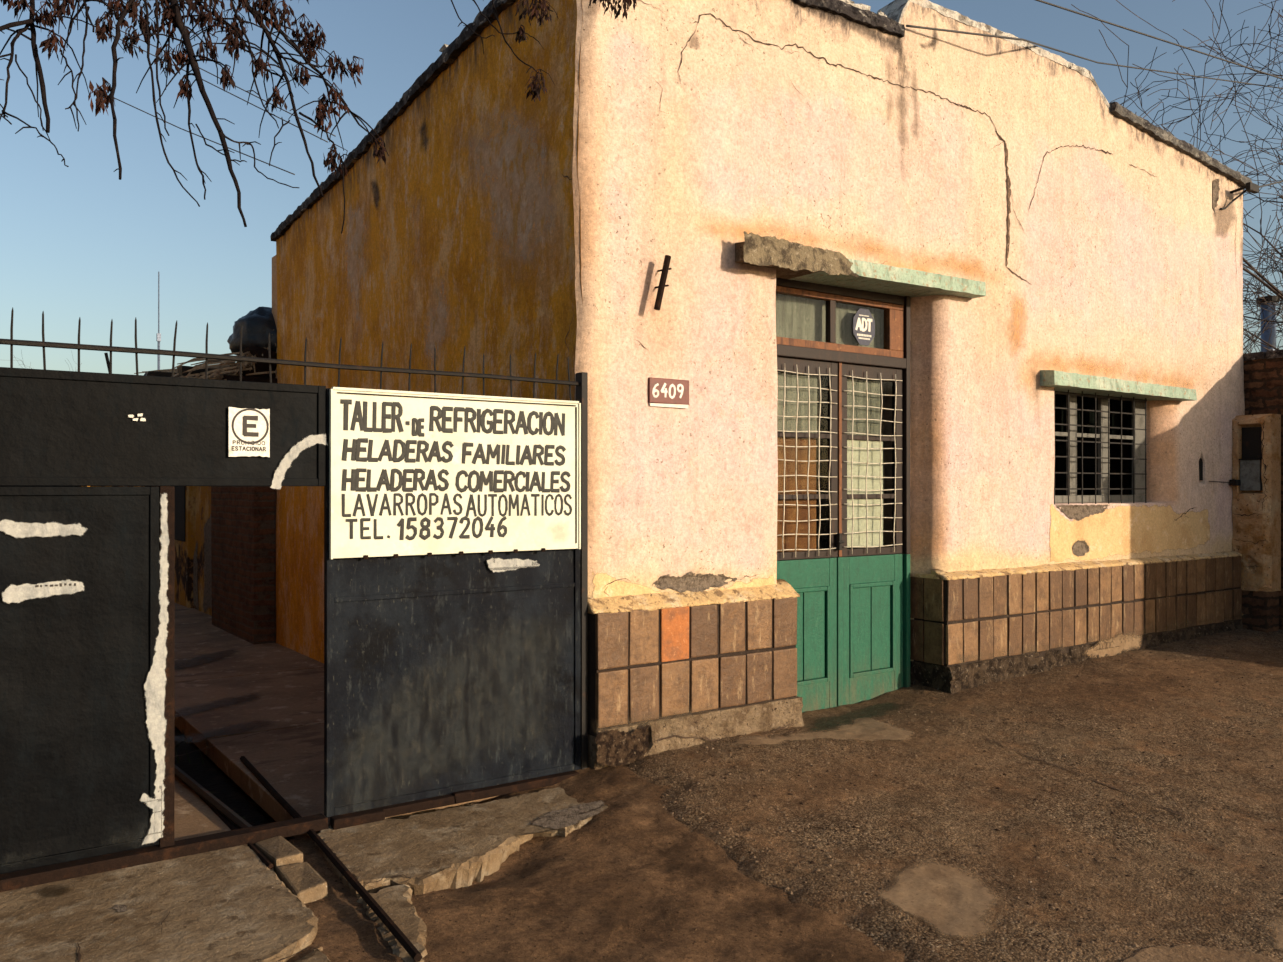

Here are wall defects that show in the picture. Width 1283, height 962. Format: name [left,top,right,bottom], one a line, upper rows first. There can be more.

crack [641,0,1156,285]
peeling [1049,504,1210,562]
peeling [592,571,775,598]